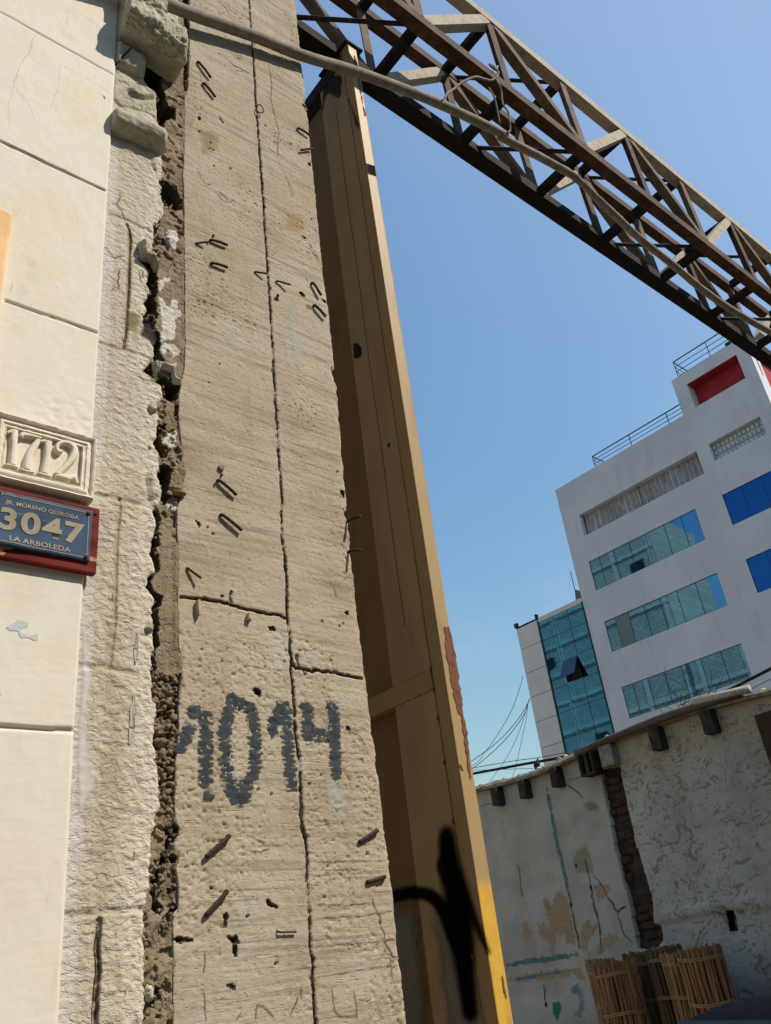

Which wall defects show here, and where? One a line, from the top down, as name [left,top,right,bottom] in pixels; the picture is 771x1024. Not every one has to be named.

hole [144,67,176,128]
hole [159,180,183,212]
crack [181,0,398,1024]
spalling [134,227,183,929]
peeling [6,620,38,640]
flaking render [603,767,664,949]
peeling [521,890,618,956]
crack [566,859,633,953]
peeling [144,984,162,1002]